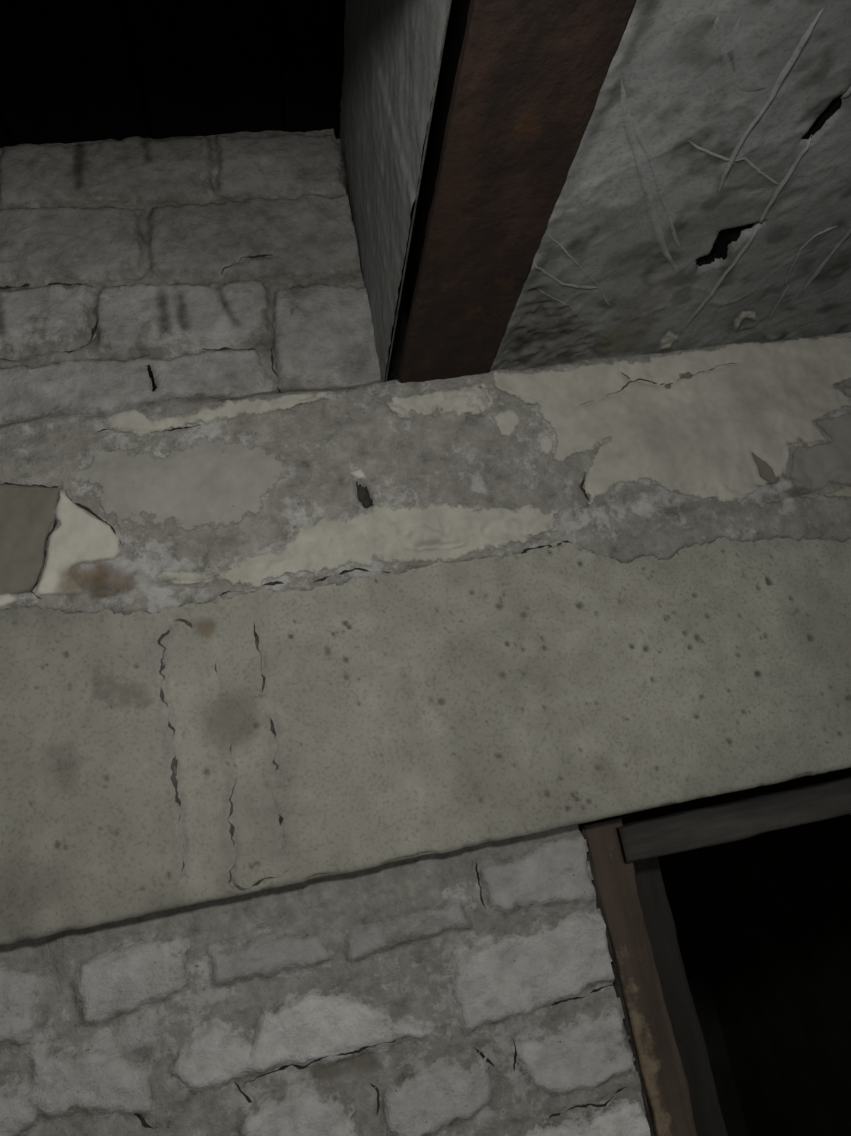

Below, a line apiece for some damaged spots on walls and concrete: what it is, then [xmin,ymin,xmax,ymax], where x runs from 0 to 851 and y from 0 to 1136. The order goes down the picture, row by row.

spalling [801,94,842,140]
hole [696,220,764,266]
peeling [97,392,328,437]
peeling [493,336,851,505]
flaking render [0,482,121,607]
peeling [155,468,572,596]
crack [254,622,266,692]
crack [158,619,192,869]
crack [228,718,290,890]
crack [233,1040,396,1103]